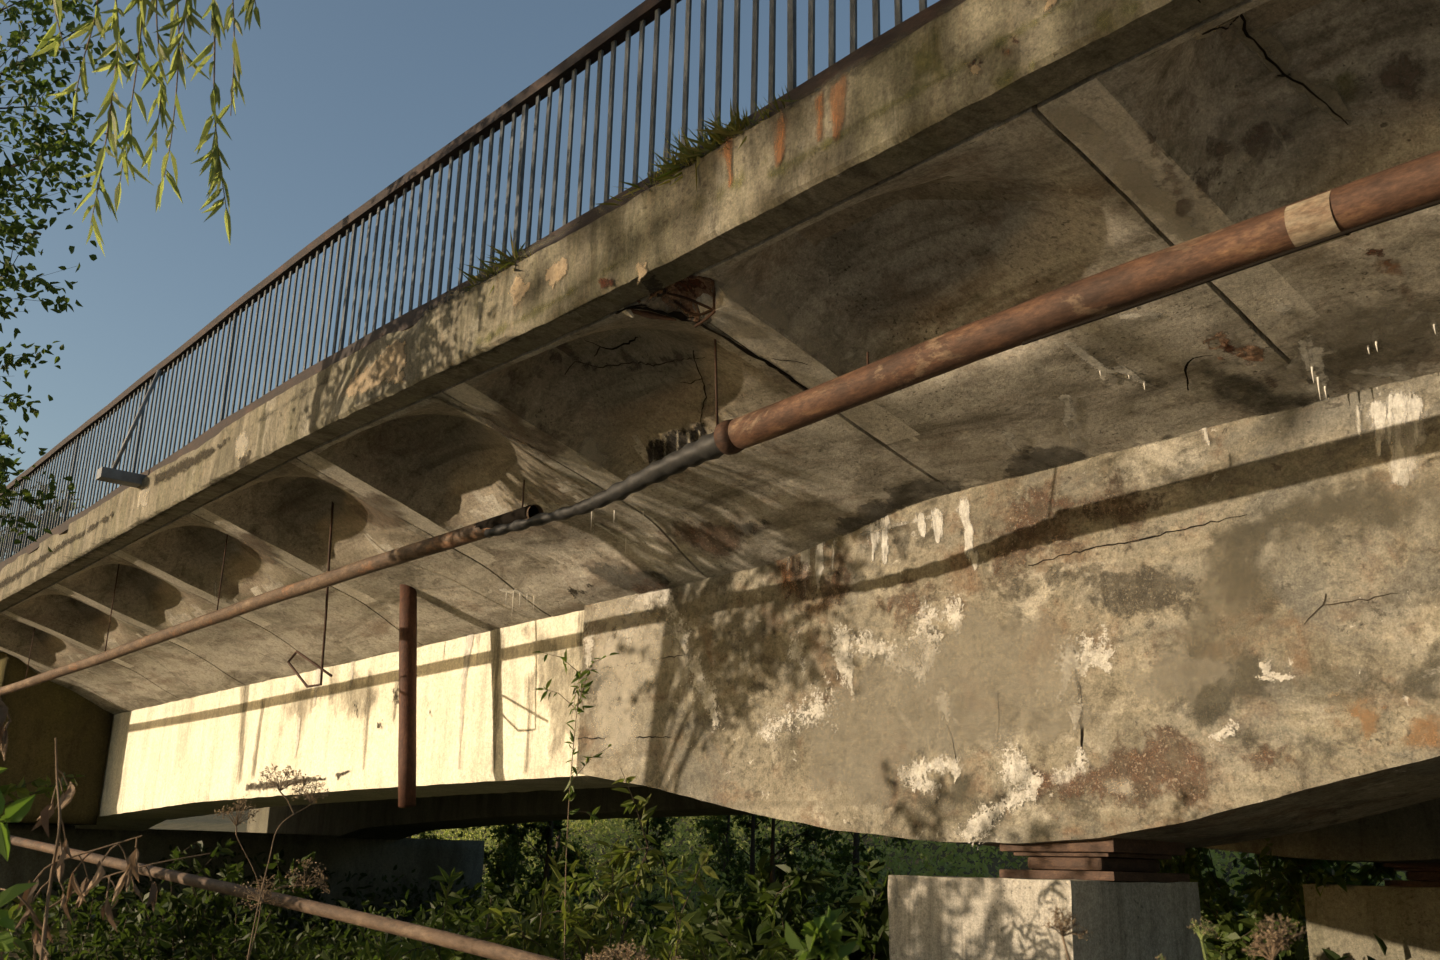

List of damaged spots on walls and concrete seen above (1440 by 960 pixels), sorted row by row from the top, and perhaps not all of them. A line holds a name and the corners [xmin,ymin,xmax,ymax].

crack [1197,0,1348,125]
rust [816,78,845,141]
spalling [621,262,716,328]
crack [565,304,808,423]
leakage [788,540,835,596]
leakage [863,499,978,570]
crack [1028,514,1247,566]
leakage [1162,303,1440,755]
leakage [940,775,969,805]